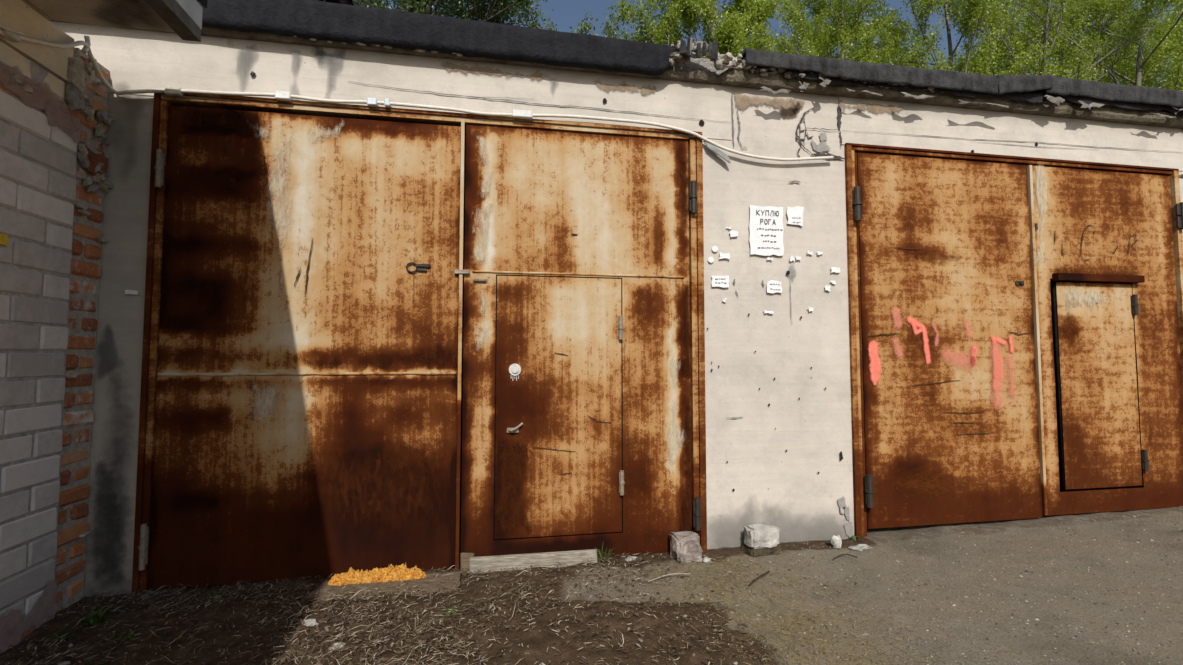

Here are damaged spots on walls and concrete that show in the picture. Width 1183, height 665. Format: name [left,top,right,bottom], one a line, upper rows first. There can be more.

leakage [240,48,252,73]
leakage [313,47,344,77]
spalling [0,57,116,216]
leakage [98,327,118,376]
rust [681,286,692,378]
rust [681,406,693,531]